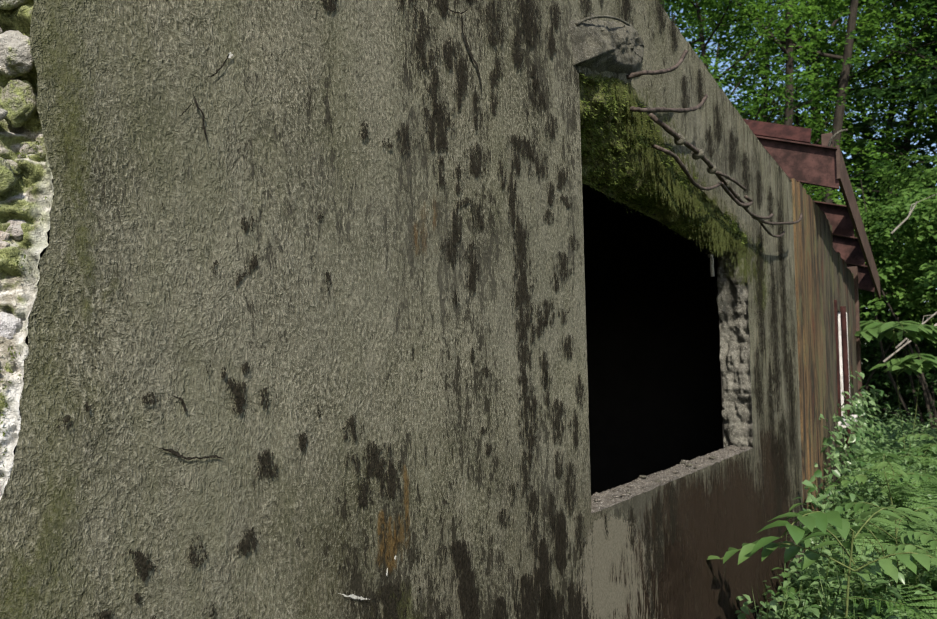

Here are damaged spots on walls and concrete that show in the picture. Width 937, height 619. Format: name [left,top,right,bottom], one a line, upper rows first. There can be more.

spalling [0,0,54,500]
leakage [236,254,260,285]
leakage [382,0,798,619]
leakage [138,392,188,412]
leakage [206,362,277,414]
leakage [295,433,310,451]
leakage [256,449,279,481]
leakage [338,415,409,507]
leakage [119,548,158,582]
leakage [188,535,208,569]
leakage [237,527,261,556]
leakage [338,568,427,619]